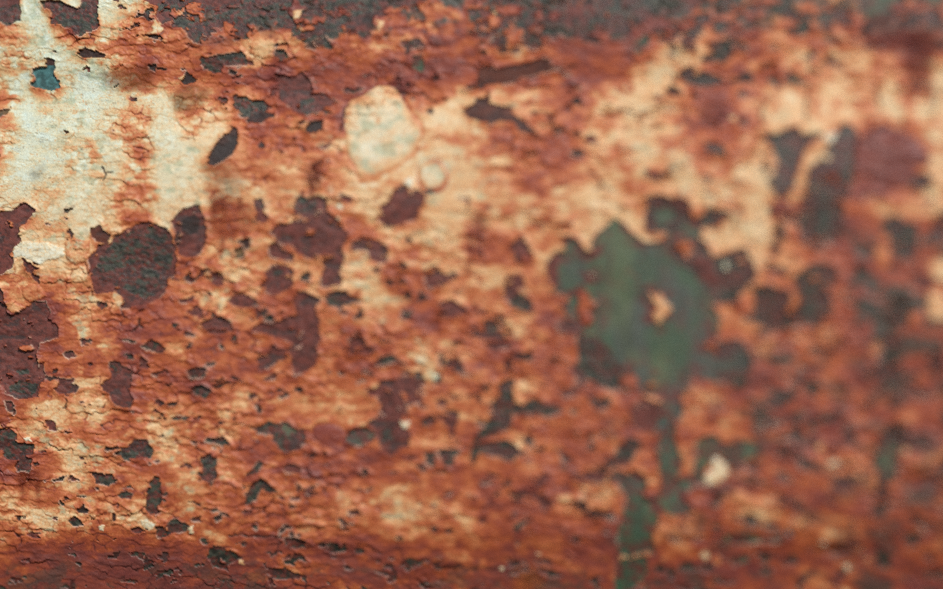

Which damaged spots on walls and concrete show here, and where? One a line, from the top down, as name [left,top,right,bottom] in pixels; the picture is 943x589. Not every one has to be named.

peeling [41,0,111,72]
peeling [120,0,428,172]
peeling [393,38,441,114]
crack [530,108,573,131]
crack [597,105,725,127]
peeling [458,0,943,163]
peeling [0,119,943,589]